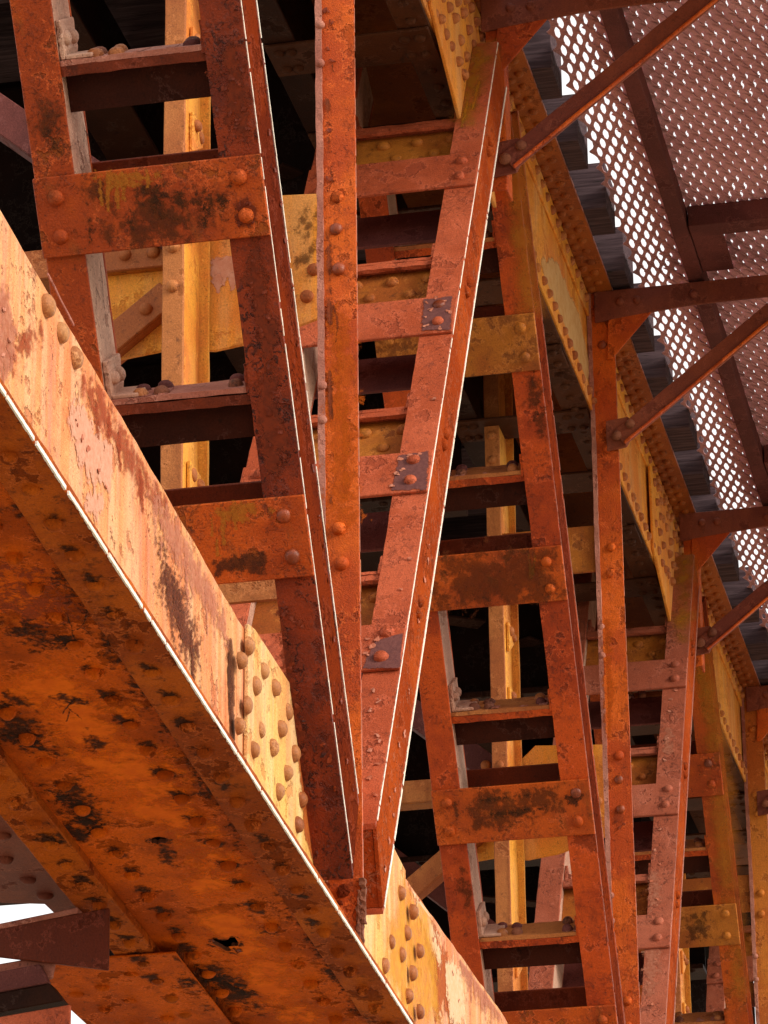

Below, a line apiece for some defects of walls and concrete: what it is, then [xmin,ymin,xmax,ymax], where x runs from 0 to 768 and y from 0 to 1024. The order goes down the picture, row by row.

corrosion [295,209,317,273]
corrosion [6,308,44,377]
corrosion [0,557,108,628]
corrosion [78,374,205,691]
corrosion [212,551,267,577]
corrosion [227,638,235,741]
corrosion [564,793,584,807]
corrosion [8,663,329,1024]
corrosion [686,912,707,943]
corrosion [426,918,500,1024]